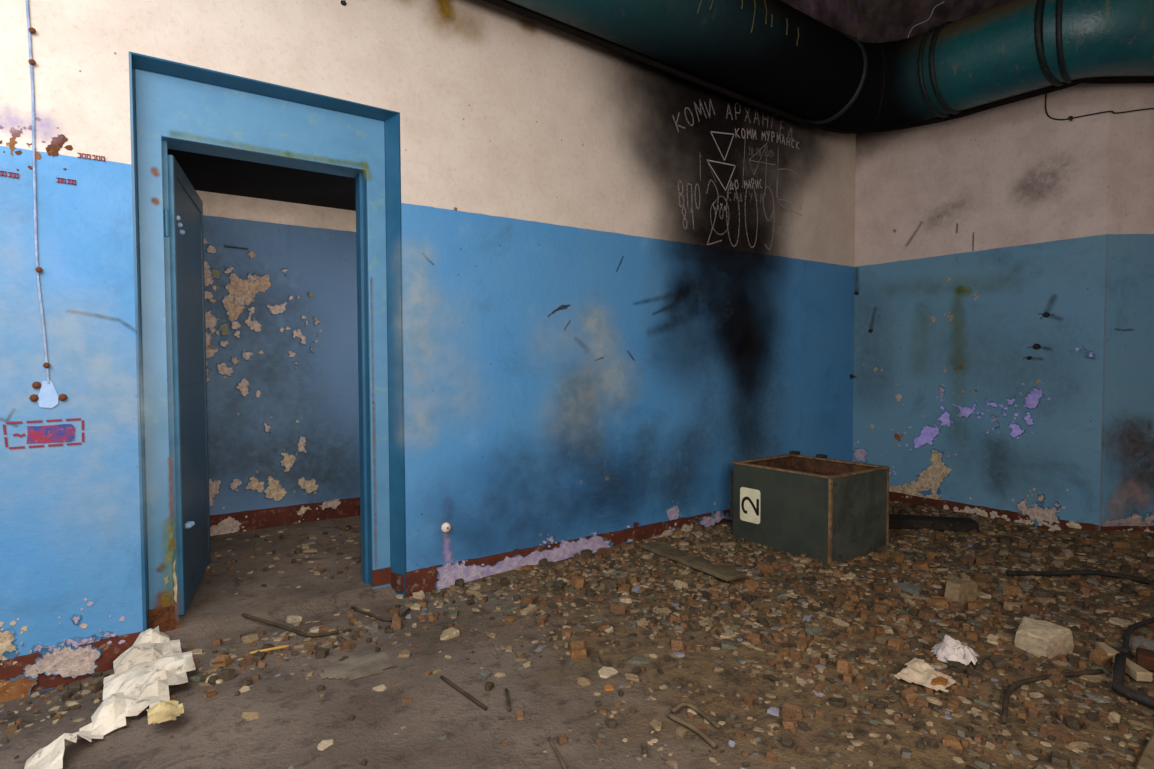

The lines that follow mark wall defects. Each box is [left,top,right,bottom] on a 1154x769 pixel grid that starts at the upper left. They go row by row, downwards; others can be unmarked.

peeling [204,238,322,398]
peeling [209,420,341,536]
peeling [435,522,639,590]
peeling [650,501,730,539]
peeling [852,441,882,463]
peeling [870,361,1082,531]
peeling [1101,510,1154,532]
flaking render [0,598,125,703]